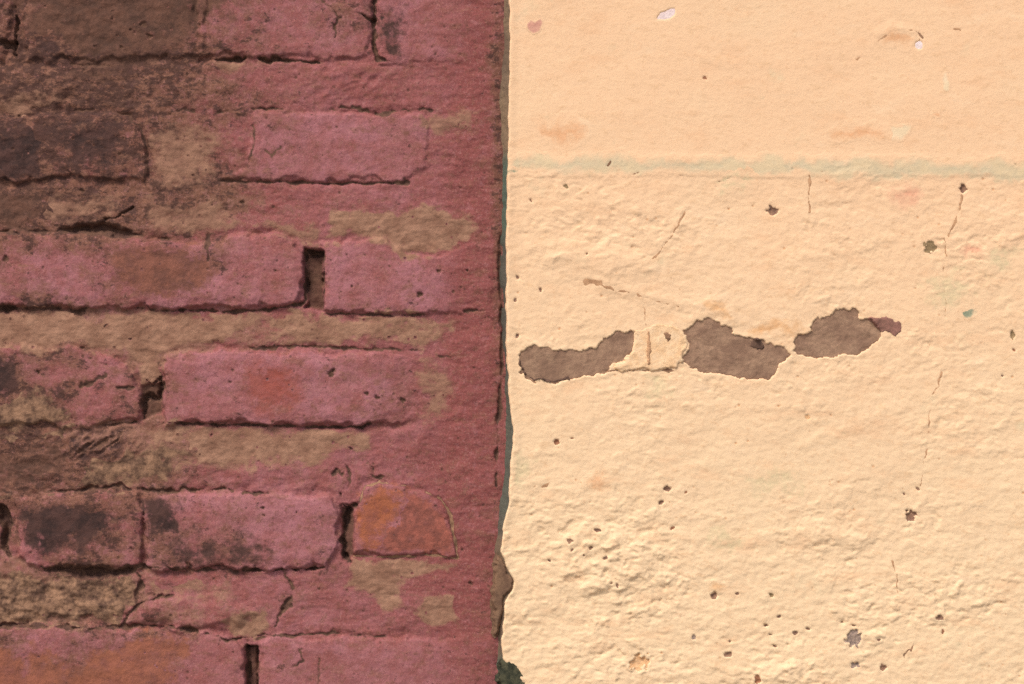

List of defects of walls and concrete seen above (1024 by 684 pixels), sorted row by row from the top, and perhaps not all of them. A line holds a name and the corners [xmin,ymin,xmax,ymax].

peeling [490,0,902,684]